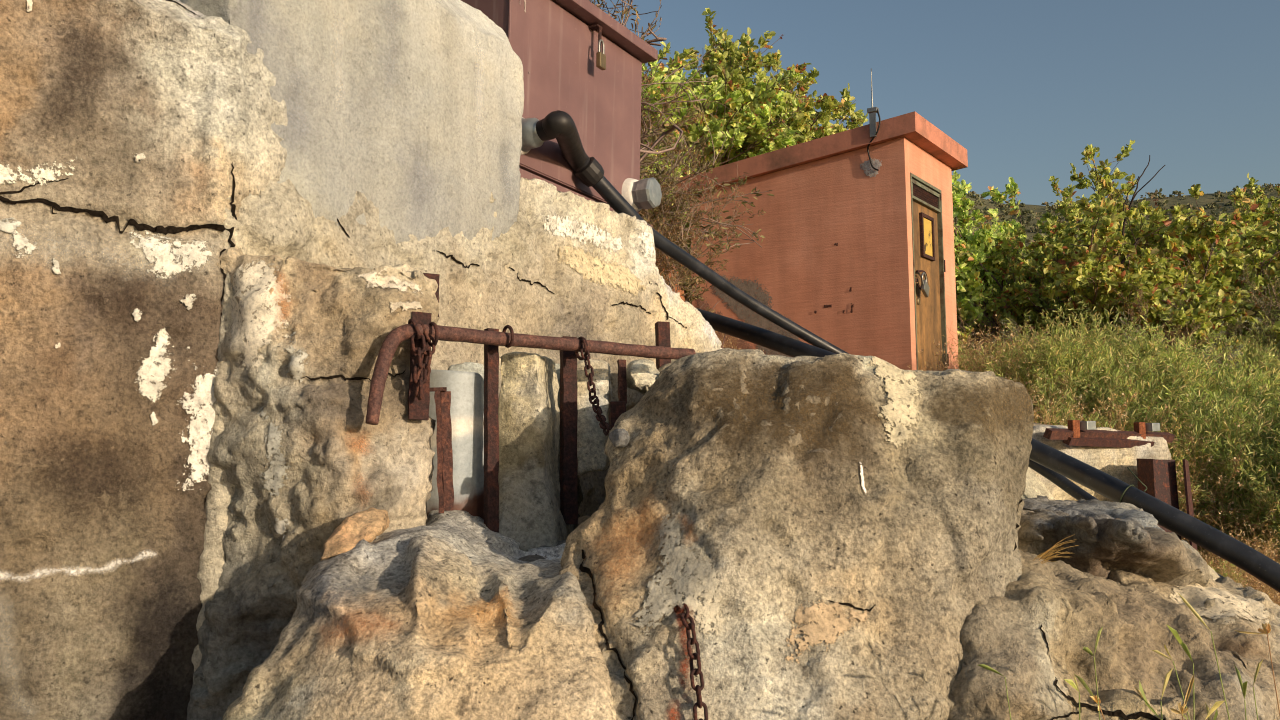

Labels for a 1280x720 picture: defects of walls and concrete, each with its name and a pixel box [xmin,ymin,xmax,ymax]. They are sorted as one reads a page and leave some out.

peeling [0,159,82,186]
crack [0,162,237,316]
peeling [180,291,197,310]
peeling [229,260,308,382]
peeling [694,271,802,342]
peeling [715,331,791,357]
peeling [134,328,218,491]
peeling [257,405,290,497]
peeling [274,518,290,544]
crack [579,549,637,720]
rust [676,607,692,684]
crack [1040,624,1180,720]